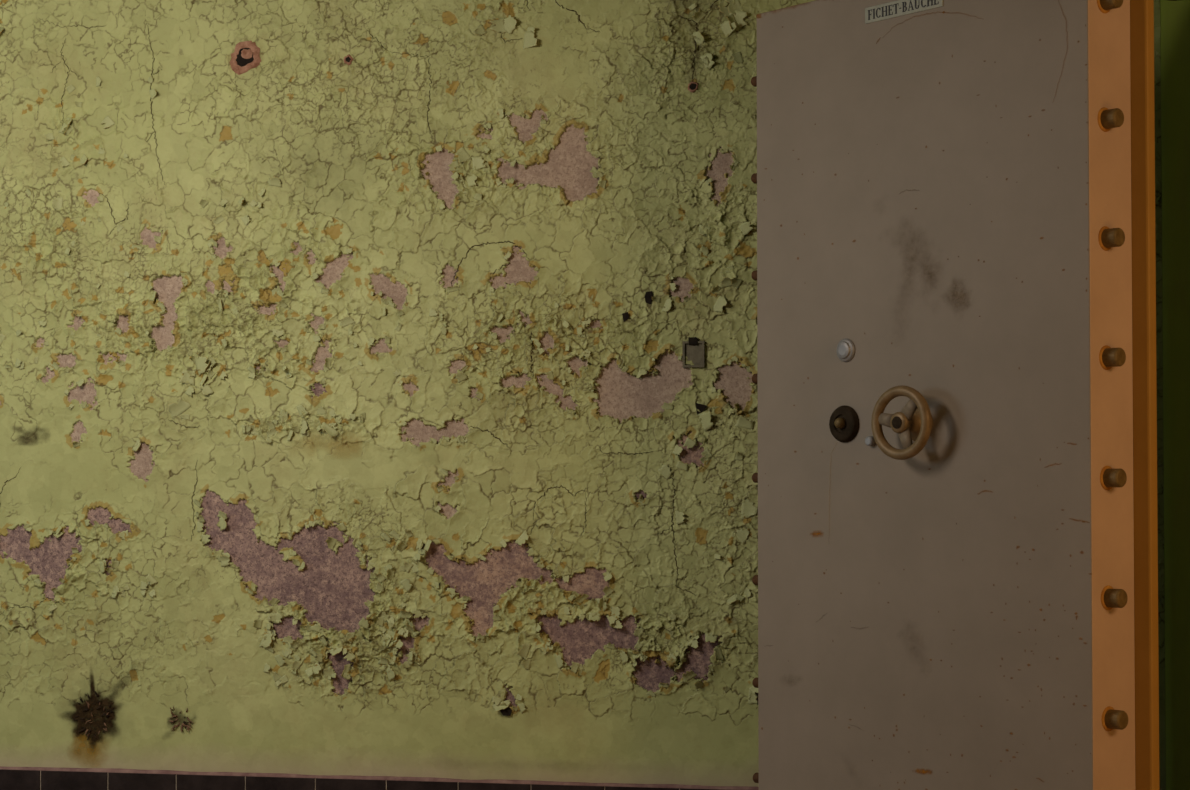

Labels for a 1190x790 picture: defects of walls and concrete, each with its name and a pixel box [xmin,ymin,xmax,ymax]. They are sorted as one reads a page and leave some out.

crack [526,0,600,32]
crack [39,18,103,126]
crack [146,23,165,185]
crack [367,30,433,140]
peeling [420,108,606,210]
peeling [145,275,188,355]
crack [451,241,530,287]
peeling [472,246,694,424]
peeling [658,403,713,480]
peeling [0,507,132,612]
peeling [193,489,725,697]
crack [661,478,696,596]